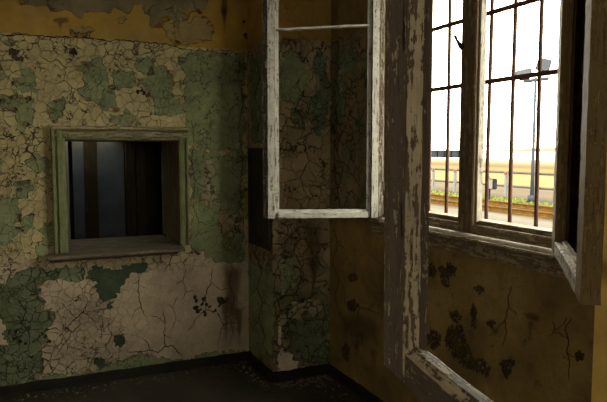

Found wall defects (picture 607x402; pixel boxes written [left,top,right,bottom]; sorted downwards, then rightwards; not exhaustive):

flaking render [18,0,209,39]
peeling [0,48,37,133]
peeling [47,96,67,124]
peeling [75,48,248,264]
peeling [0,179,54,258]
peeling [0,262,246,386]
crack [53,225,345,361]
flaking render [276,346,305,372]